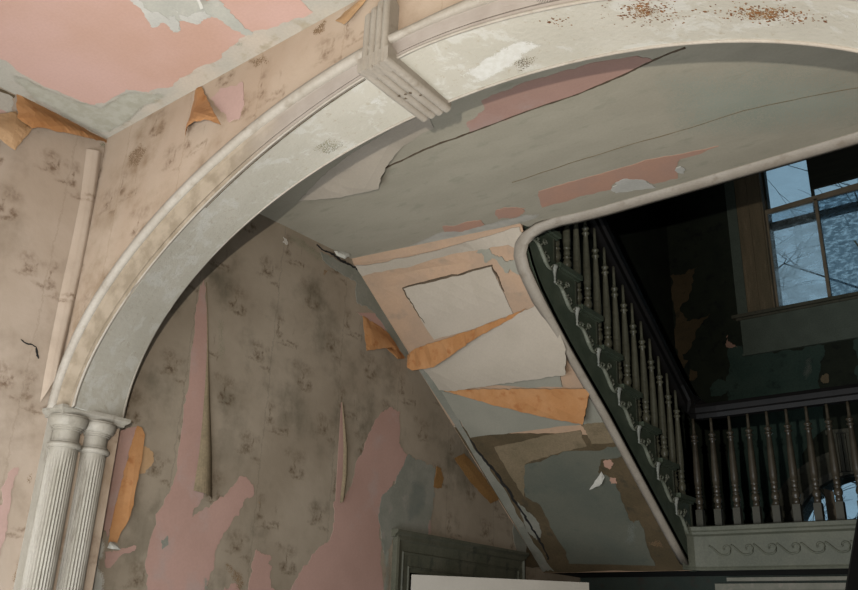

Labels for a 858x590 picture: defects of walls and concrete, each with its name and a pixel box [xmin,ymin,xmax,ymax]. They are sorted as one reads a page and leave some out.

peeling [0,0,313,133]
corrosion [614,0,827,29]
peeling [538,146,718,208]
crack [512,88,856,183]
peeling [320,207,525,358]
peeling [671,267,709,381]
peeling [145,279,254,590]
peeling [291,407,407,590]
peeling [419,369,683,573]
peeling [224,549,275,590]